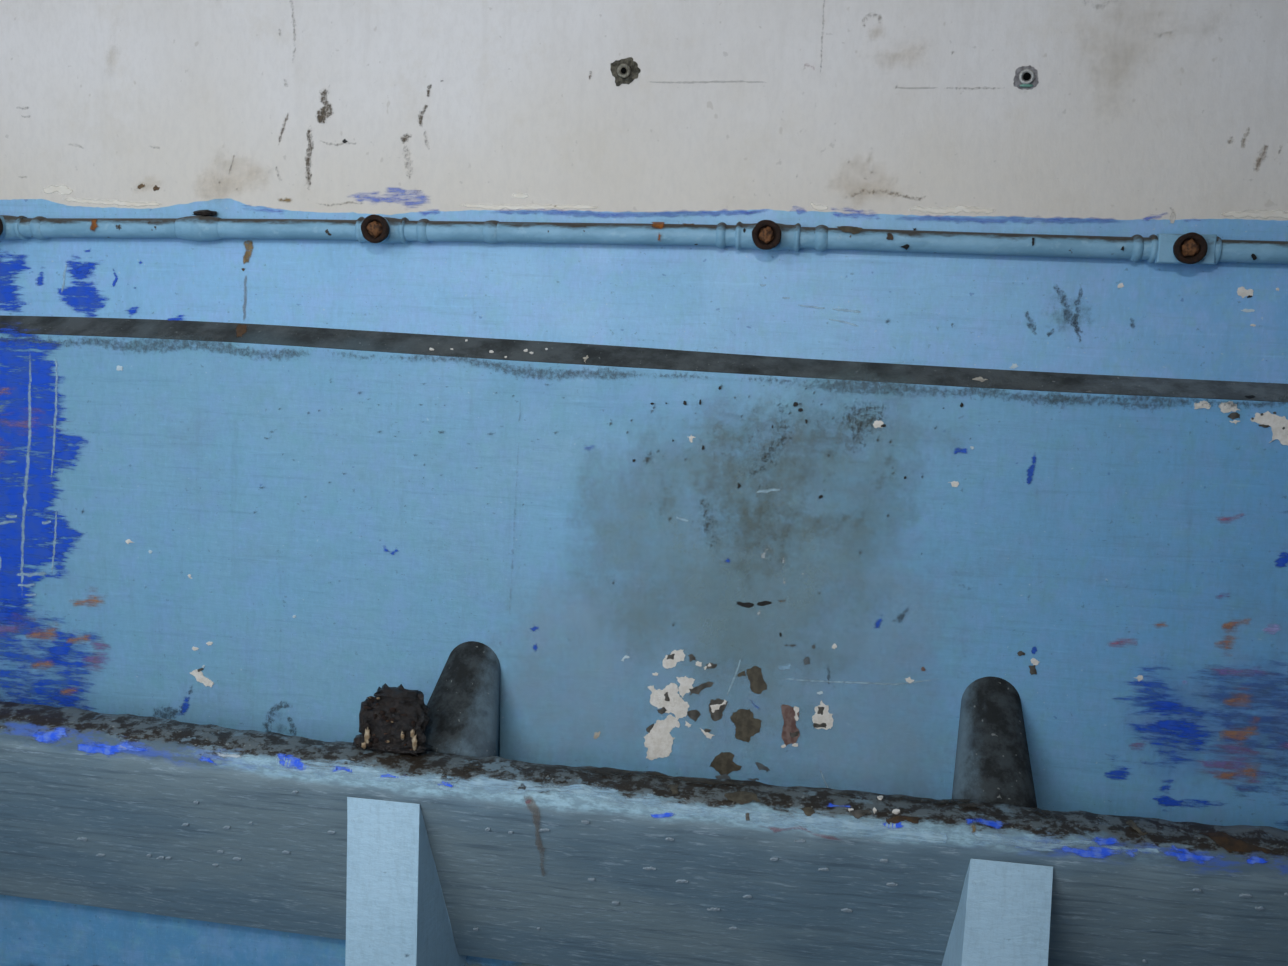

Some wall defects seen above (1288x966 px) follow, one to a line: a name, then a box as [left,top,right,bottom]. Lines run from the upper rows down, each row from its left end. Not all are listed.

flaking render [610,57,641,86]
peeling [58,250,118,317]
peeling [1194,401,1288,445]
peeling [0,254,108,710]
peeling [1275,552,1288,567]
peeling [1220,622,1238,649]
spalling [277,647,1288,864]